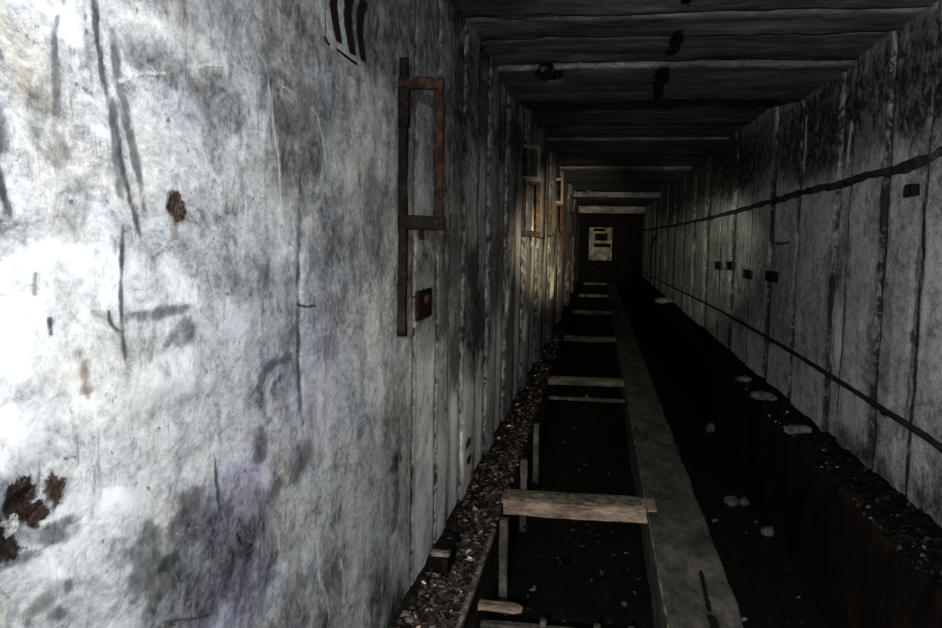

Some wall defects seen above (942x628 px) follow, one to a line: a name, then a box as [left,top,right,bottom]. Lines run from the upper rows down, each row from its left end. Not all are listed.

damp [52,15,61,111]
damp [0,107,10,151]
damp [91,0,156,234]
damp [268,83,283,211]
damp [0,169,19,225]
corrosion [167,190,187,237]
peeling [903,247,922,439]
damp [253,425,266,463]
damp [272,478,281,498]
damp [111,486,203,612]